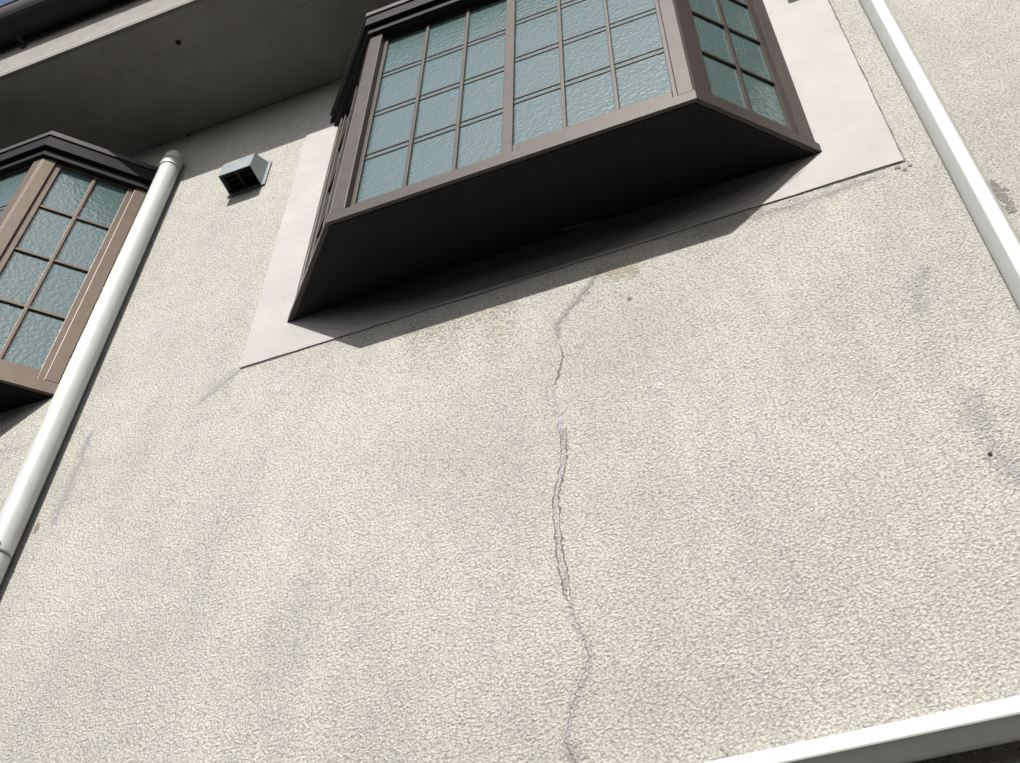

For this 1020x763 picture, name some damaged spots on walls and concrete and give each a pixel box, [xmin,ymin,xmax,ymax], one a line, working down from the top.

crack [545,270,598,763]